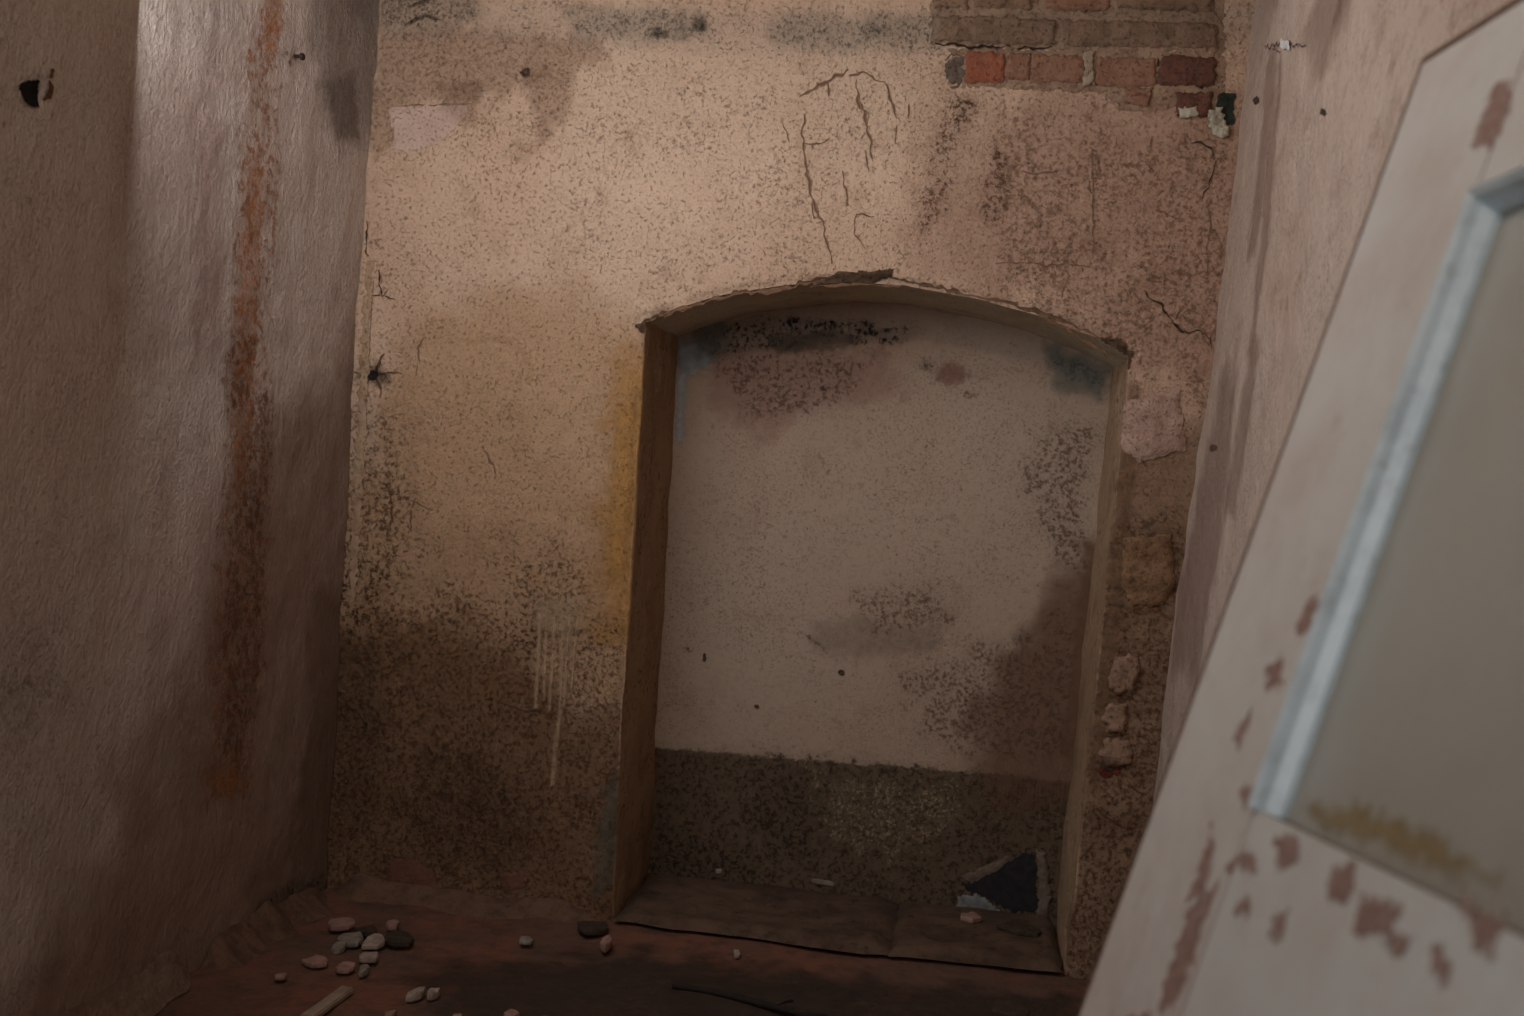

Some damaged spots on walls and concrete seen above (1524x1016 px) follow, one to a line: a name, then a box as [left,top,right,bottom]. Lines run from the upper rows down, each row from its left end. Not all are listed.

corrosion [206,0,296,799]
damp [676,317,907,442]
crack [782,69,910,264]
flaking render [918,0,1259,228]
damp [108,372,641,988]
damp [647,451,1196,980]